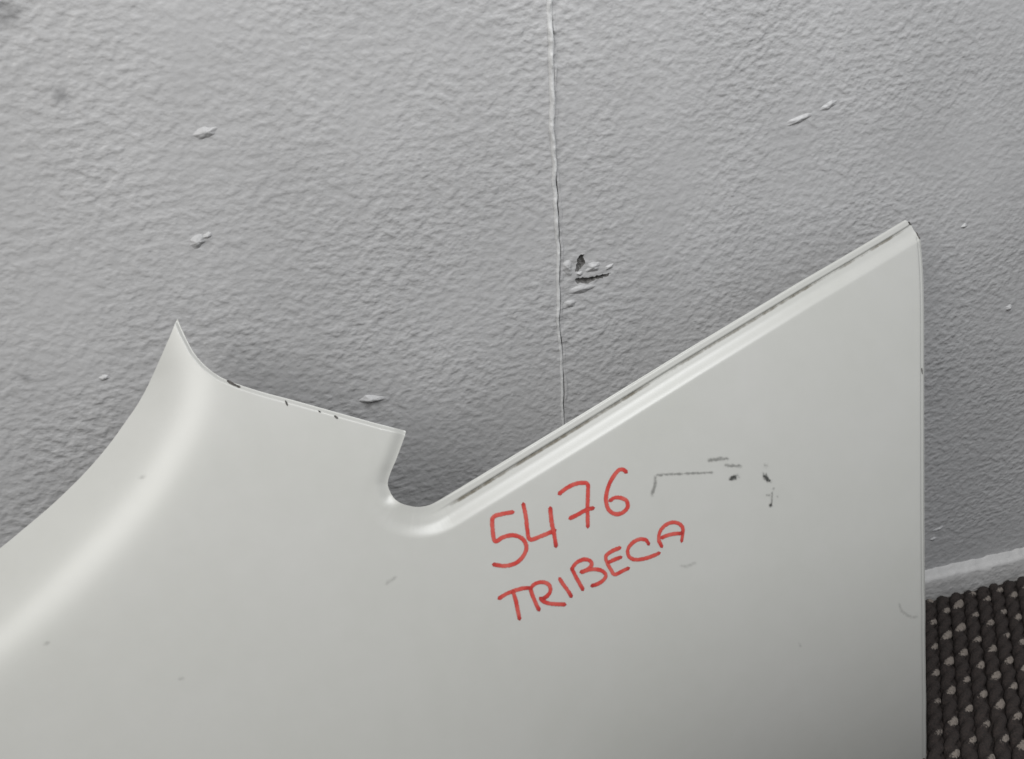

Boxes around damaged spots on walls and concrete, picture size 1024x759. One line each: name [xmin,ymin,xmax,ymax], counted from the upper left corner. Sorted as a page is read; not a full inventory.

crack [546,0,568,425]
spalling [562,254,614,309]